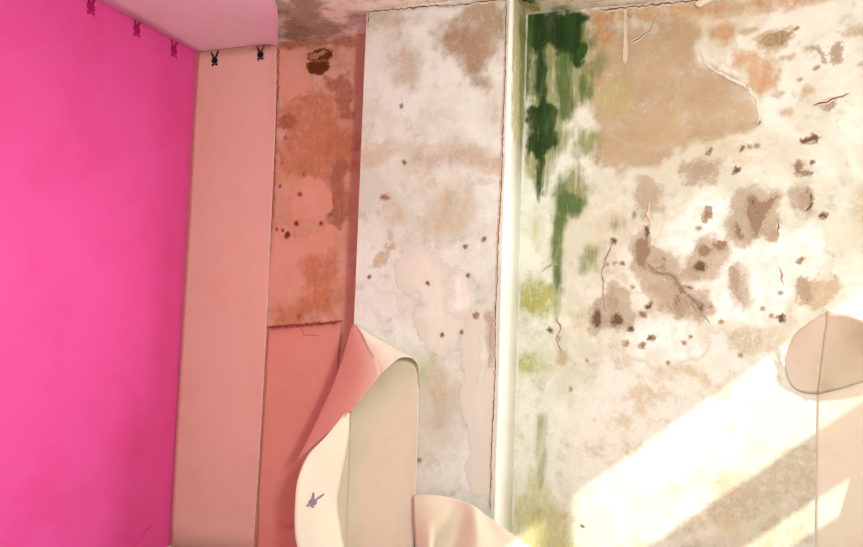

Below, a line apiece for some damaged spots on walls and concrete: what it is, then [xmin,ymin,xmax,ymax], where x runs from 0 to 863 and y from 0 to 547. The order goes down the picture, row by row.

leakage [280,0,352,49]
leakage [445,2,503,71]
crack [588,0,720,46]
peeling [276,40,333,103]
leakage [512,0,624,198]
crack [699,48,761,126]
leakage [328,161,348,226]
leakage [521,172,586,314]
leakage [632,188,779,320]